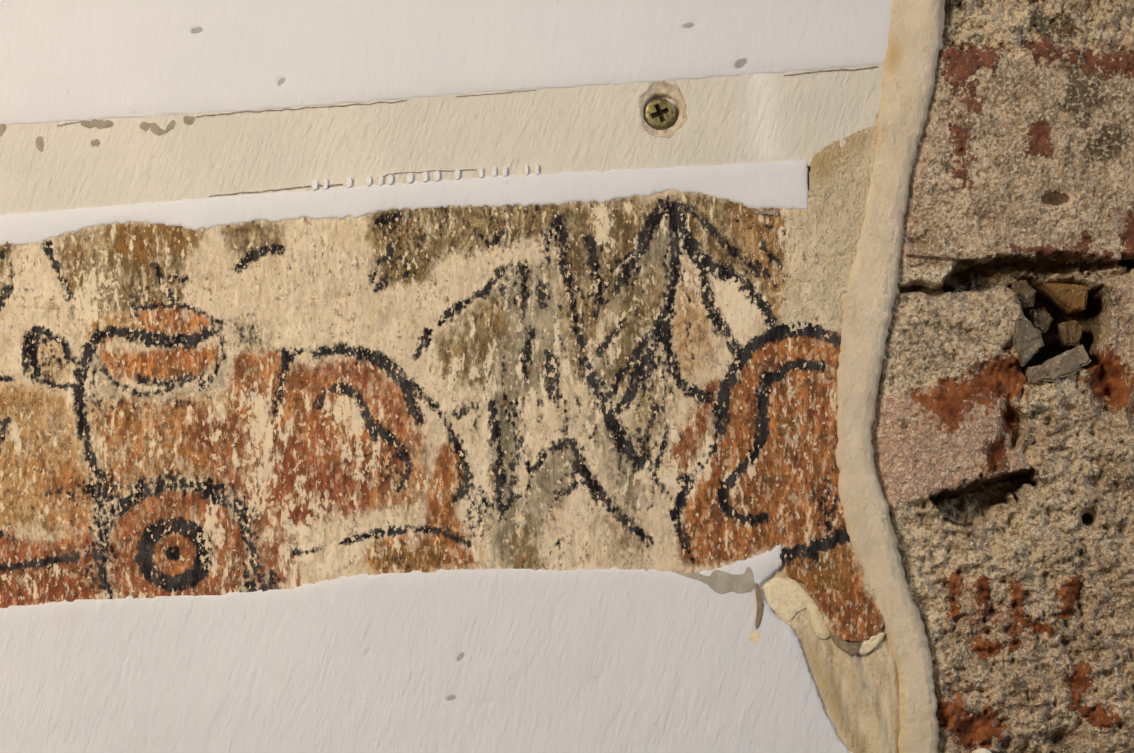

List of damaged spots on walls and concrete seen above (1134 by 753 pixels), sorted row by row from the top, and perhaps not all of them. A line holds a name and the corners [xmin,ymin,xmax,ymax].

spalling [1006,206,1134,265]
crack [898,254,1134,296]
spalling [911,276,1134,475]
crack [929,468,1039,528]